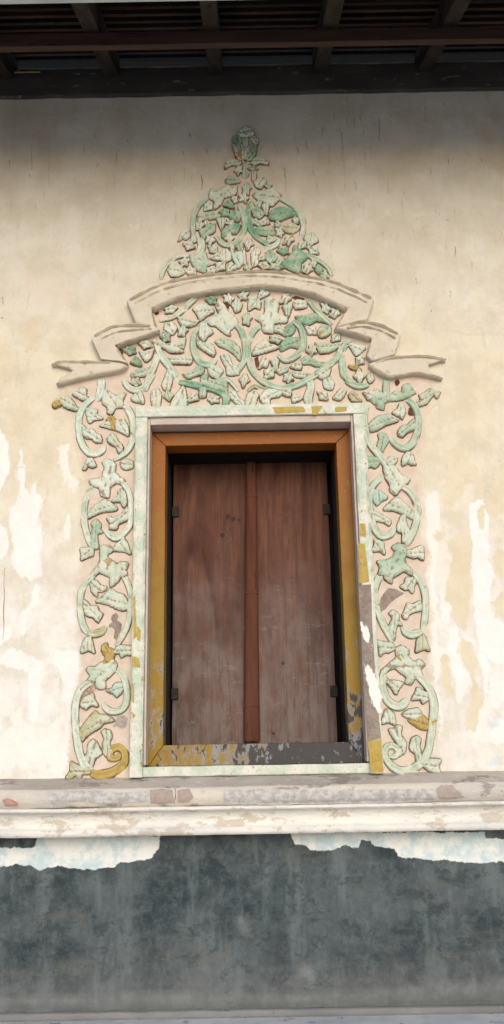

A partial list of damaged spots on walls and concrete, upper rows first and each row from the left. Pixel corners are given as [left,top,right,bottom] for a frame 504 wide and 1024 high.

peeling [0,428,97,775]
peeling [424,490,504,746]
peeling [0,836,161,871]
peeling [290,831,504,864]